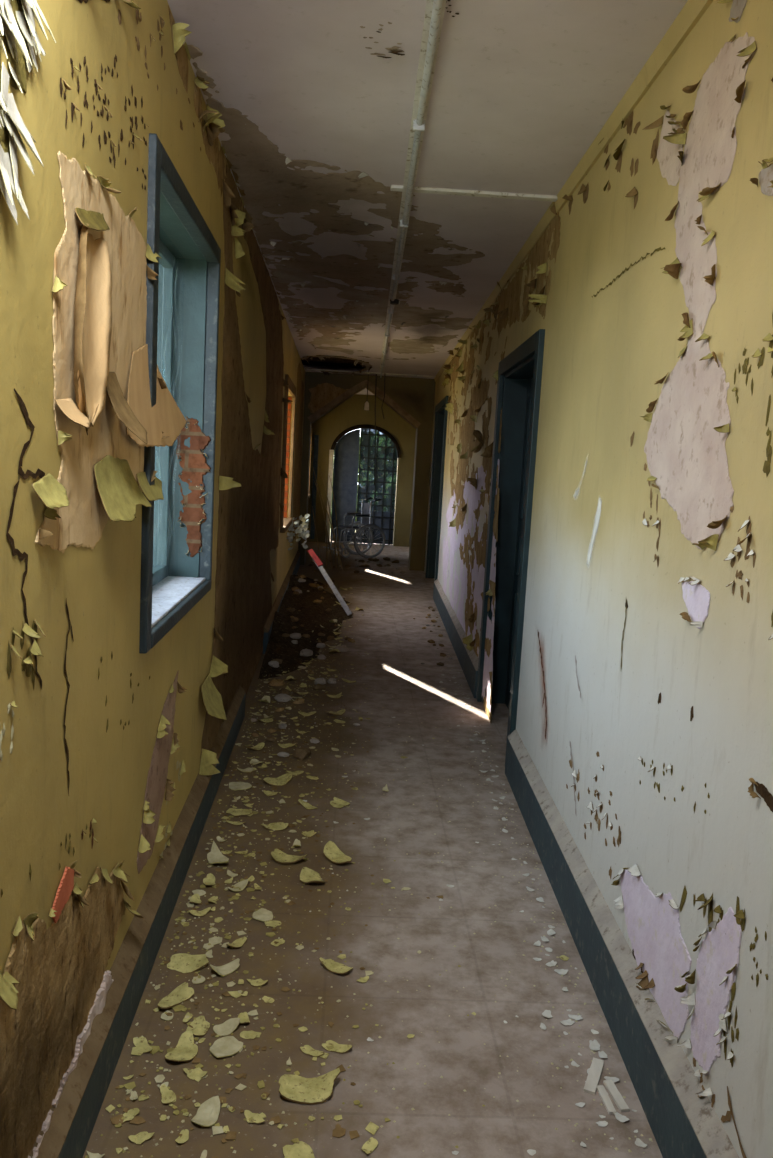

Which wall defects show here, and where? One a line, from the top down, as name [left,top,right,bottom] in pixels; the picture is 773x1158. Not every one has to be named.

peeling [600,0,773,603]
crack [6,388,74,794]
spalling [0,0,589,1158]
peeling [678,576,710,629]
peeling [566,751,621,847]
peeling [638,756,684,801]
peeling [747,778,773,812]
peeling [609,864,768,1108]